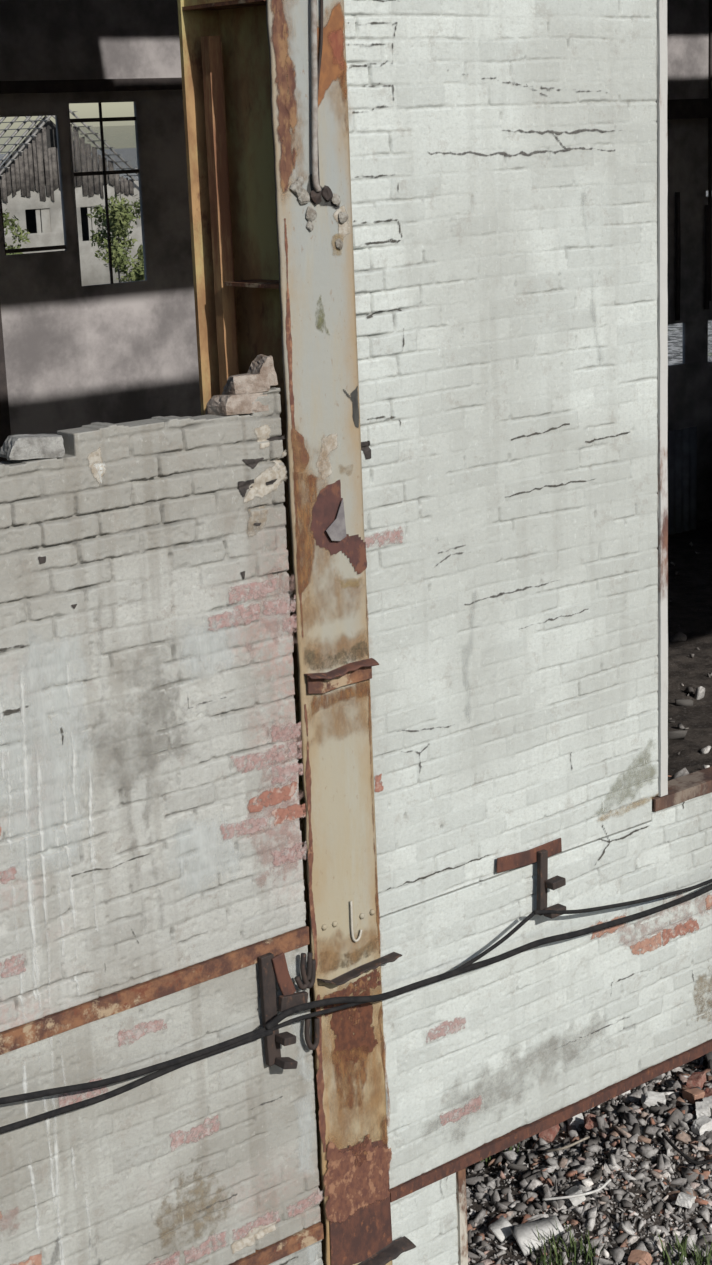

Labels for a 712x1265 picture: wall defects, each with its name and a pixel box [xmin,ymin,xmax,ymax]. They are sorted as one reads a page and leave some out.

rust [317,3,347,106]
rust [271,0,297,192]
crack [429,129,615,157]
crack [511,423,629,443]
crack [509,479,594,497]
peeling [208,571,297,633]
peeling [220,722,306,840]
rust [304,681,381,971]
peeling [630,895,712,955]
rust [316,968,392,1223]
peeling [12,1254,42,1265]